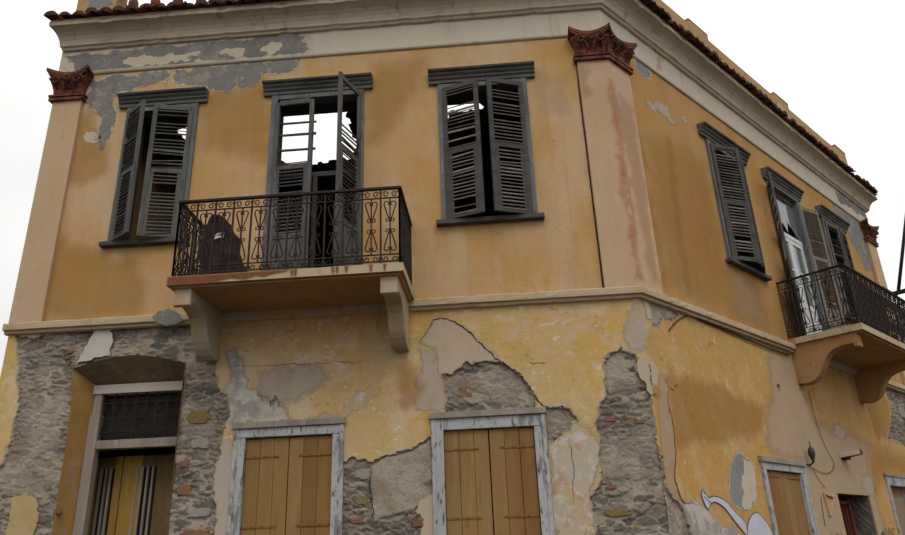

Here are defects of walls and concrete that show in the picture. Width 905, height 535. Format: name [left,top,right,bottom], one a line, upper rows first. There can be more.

peeling [62,33,310,150]
peeling [646,100,687,125]
peeling [832,191,873,271]
spalling [0,309,326,535]
spalling [414,301,741,535]
spalling [885,388,905,446]
spalling [342,436,434,535]
flaking render [728,451,757,512]